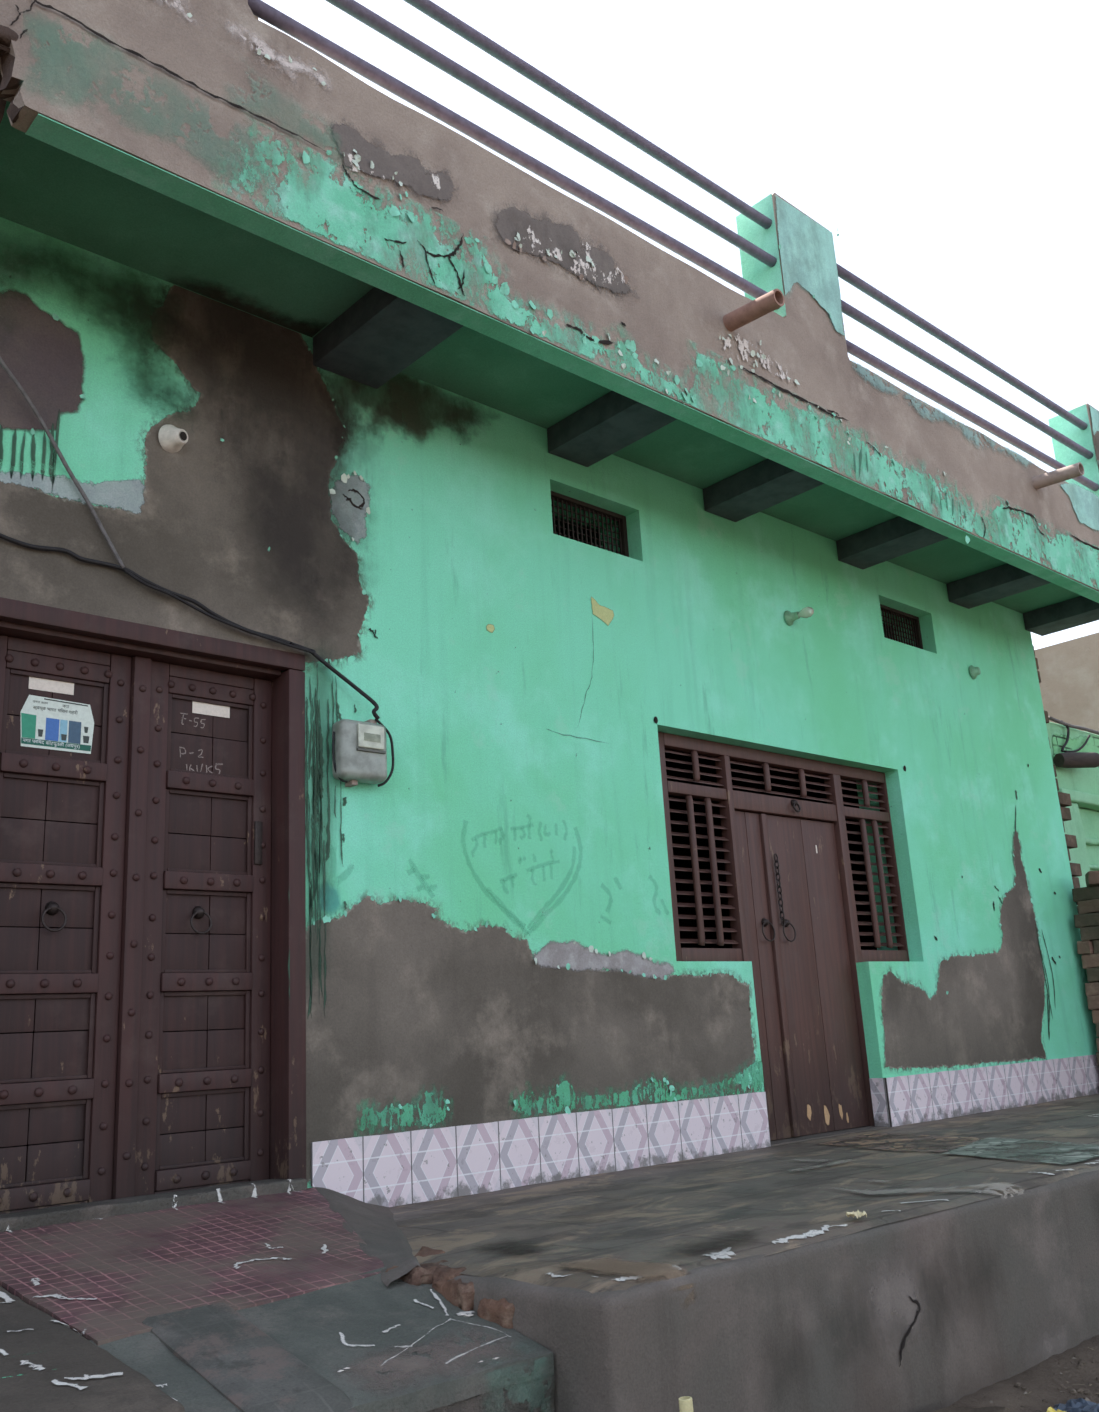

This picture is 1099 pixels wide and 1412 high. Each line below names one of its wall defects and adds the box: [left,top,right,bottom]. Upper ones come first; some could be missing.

spalling [0,25,24,123]
crack [10,0,381,200]
peeling [0,284,371,664]
crack [384,207,465,296]
peeling [232,122,1099,589]
water stain [305,674,357,1017]
peeling [306,895,760,1182]
peeling [881,790,1055,1127]
crack [899,1296,921,1367]